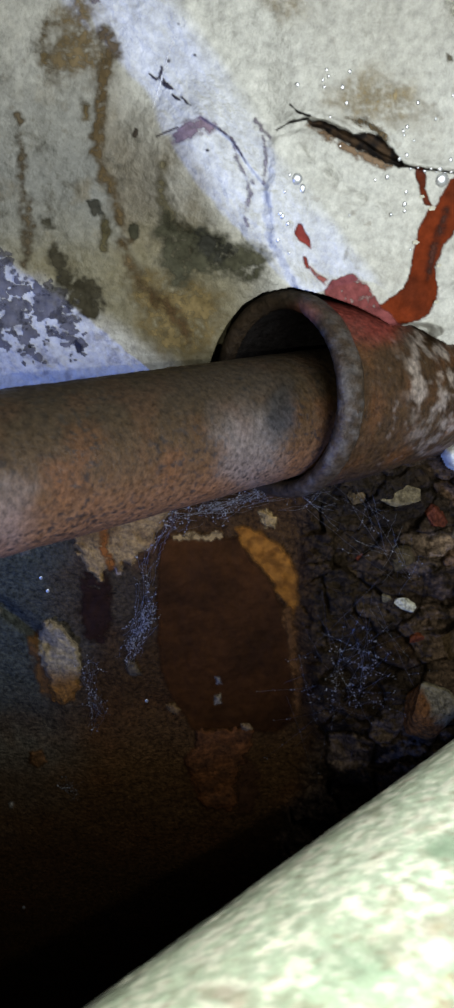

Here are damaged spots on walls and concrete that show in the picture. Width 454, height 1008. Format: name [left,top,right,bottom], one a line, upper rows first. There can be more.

water stain [14,112,55,268]
peeling [0,248,88,367]
water stain [49,245,106,319]
water stain [39,0,139,252]
water stain [154,161,268,287]
rust [310,267,402,326]
crack [278,104,454,173]
peeling [28,619,82,705]